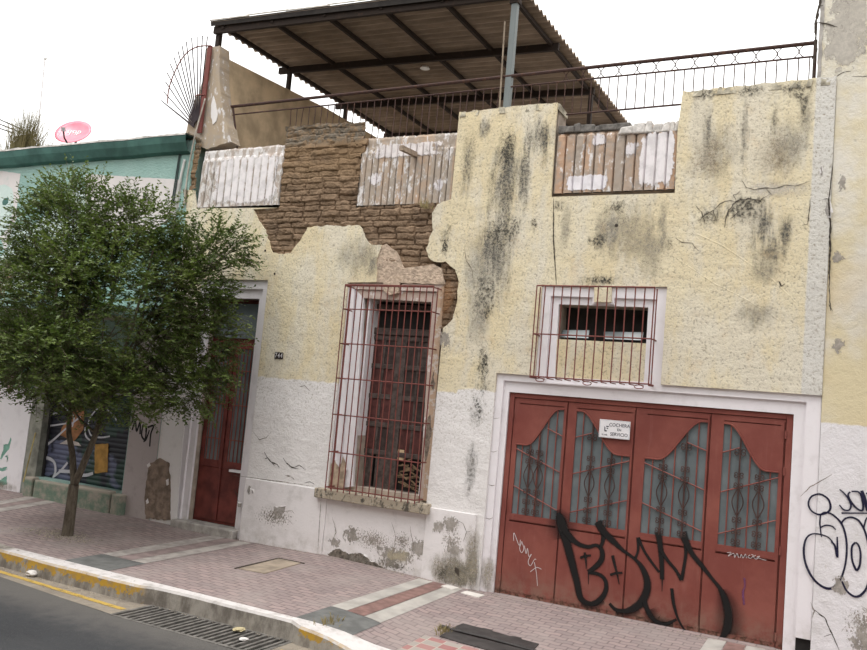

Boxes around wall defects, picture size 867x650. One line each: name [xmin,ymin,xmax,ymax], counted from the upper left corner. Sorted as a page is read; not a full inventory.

peeling [823,0,867,72]
spalling [212,122,459,348]
damp [478,219,519,318]
damp [492,136,530,211]
damp [732,198,768,234]
crack [696,181,809,227]
crack [804,169,833,311]
crack [234,433,314,499]
peeling [328,525,424,570]
damp [434,538,493,586]
peeling [831,576,849,595]
peeling [841,608,867,650]